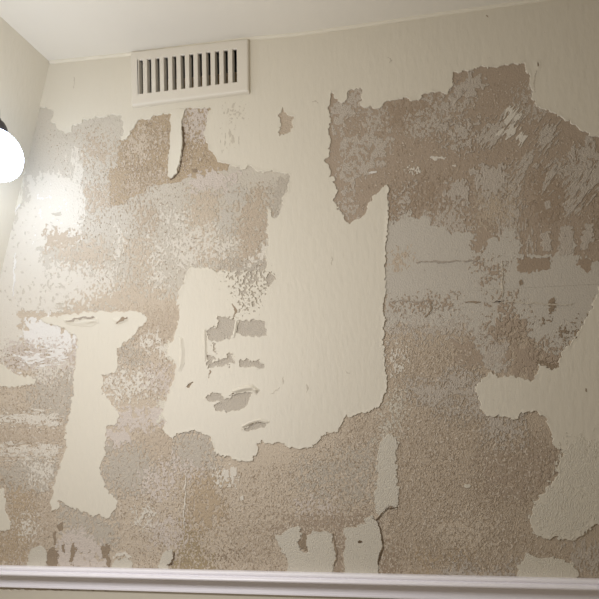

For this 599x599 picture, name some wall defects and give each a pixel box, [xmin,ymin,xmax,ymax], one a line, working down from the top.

peeling [325,63,599,291]
peeling [0,108,599,578]
crack [372,507,397,569]